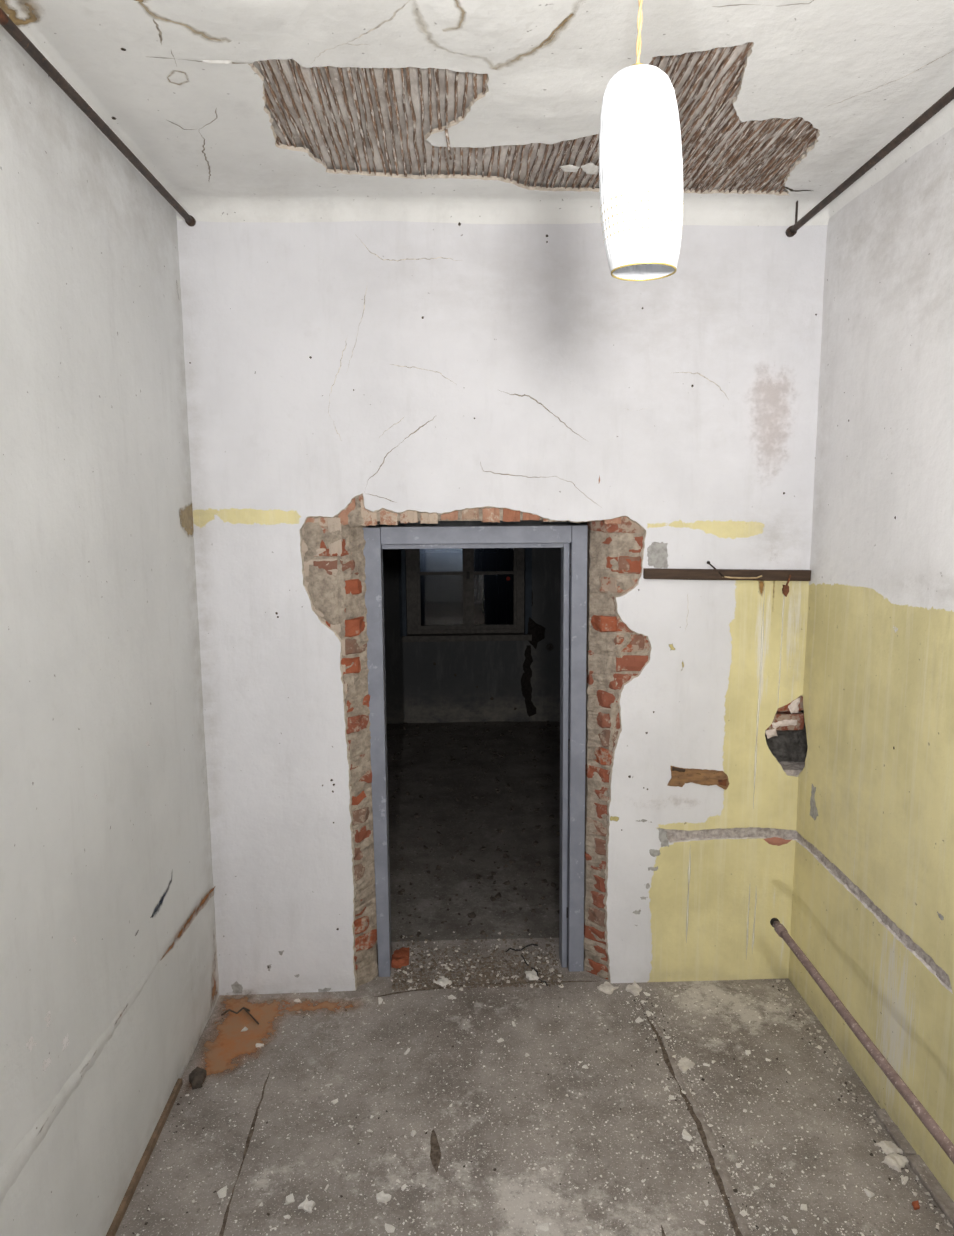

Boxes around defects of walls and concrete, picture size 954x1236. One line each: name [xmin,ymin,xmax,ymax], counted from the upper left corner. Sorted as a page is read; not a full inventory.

leakage [0,0,38,26]
leakage [134,0,219,41]
crack [310,1,409,64]
leakage [512,14,573,61]
spalling [248,59,599,192]
spalling [649,42,820,196]
crack [499,390,584,439]
crack [367,418,434,502]
crack [480,462,602,508]
spalling [299,493,669,990]
spalling [765,695,808,777]
rust [203,975,354,1076]